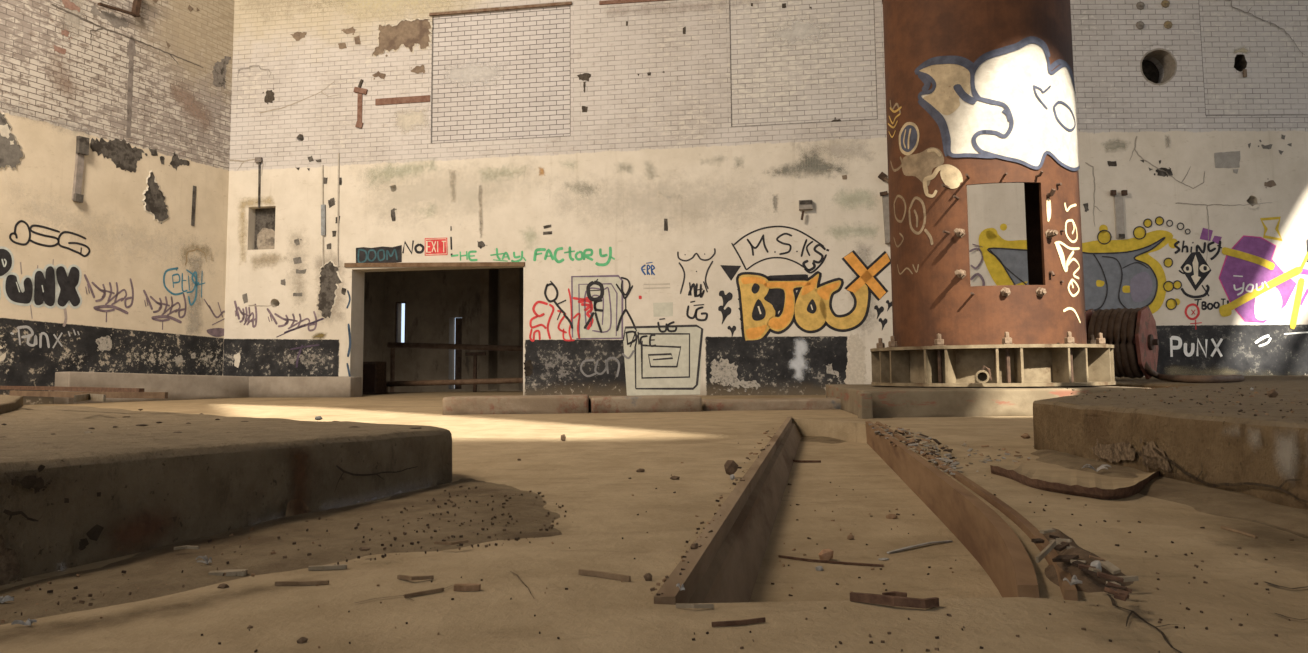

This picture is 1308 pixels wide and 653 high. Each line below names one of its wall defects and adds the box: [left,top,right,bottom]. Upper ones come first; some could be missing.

peeling [338,18,433,80]
crack [1230,0,1303,54]
peeling [0,111,25,172]
peeling [90,138,190,224]
peeling [281,156,346,320]